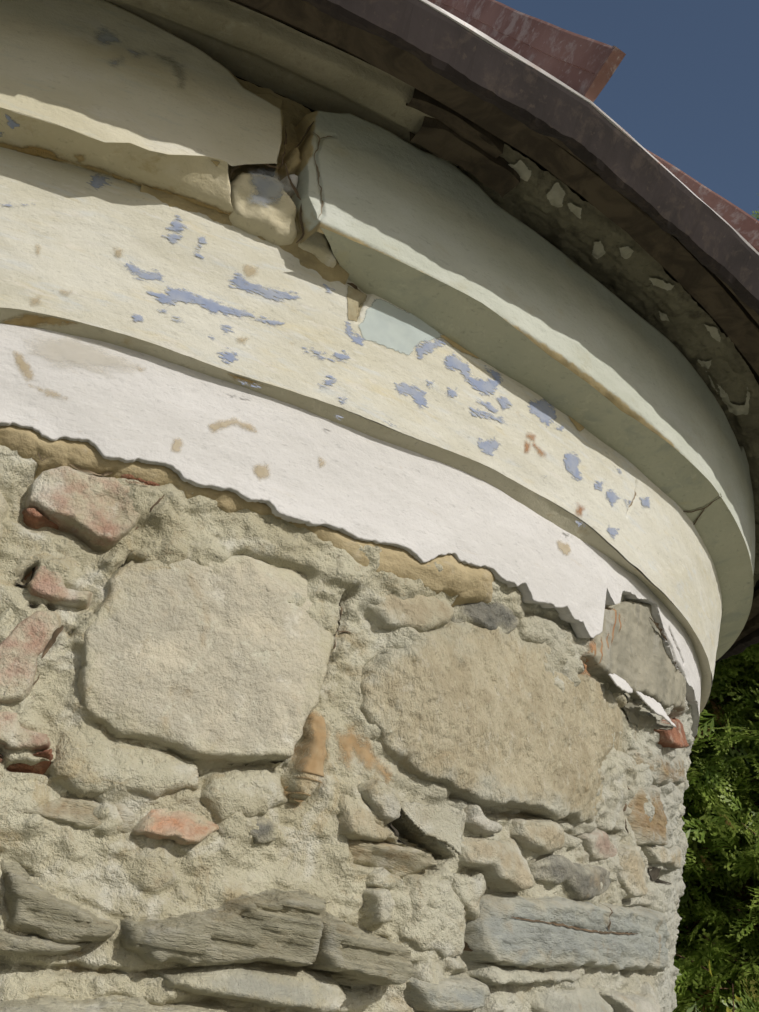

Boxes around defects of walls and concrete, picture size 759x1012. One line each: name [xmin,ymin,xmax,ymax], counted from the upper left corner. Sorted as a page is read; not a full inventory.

crack [229,121,332,243]
peeling [546,182,582,219]
peeling [124,262,285,333]
peeling [229,273,300,302]
flaking render [344,286,376,346]
peeling [394,379,433,409]
peeling [416,335,513,424]
peeling [528,399,584,432]
flaking render [0,425,495,607]
peeling [563,451,583,481]
peeling [594,480,650,508]
peeling [582,600,686,730]